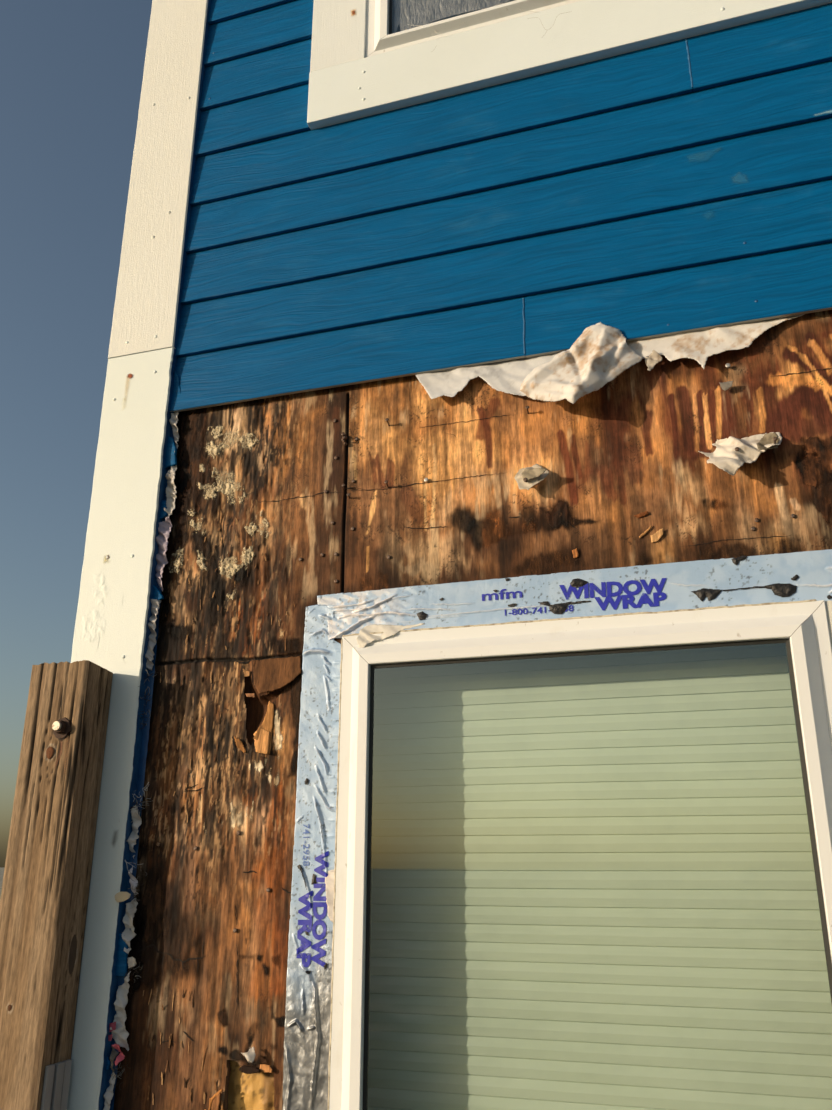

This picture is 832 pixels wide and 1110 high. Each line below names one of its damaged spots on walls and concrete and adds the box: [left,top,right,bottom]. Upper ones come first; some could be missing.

leakage [795,436,832,527]
leakage [172,412,247,626]
leakage [451,500,595,549]
leakage [516,552,578,575]
leakage [697,543,748,560]
leakage [781,539,798,553]
leakage [159,590,195,640]
peeling [232,616,301,772]
leakage [249,673,302,786]
leakage [128,840,200,998]
leakage [271,1011,285,1027]
leakage [218,1028,260,1080]